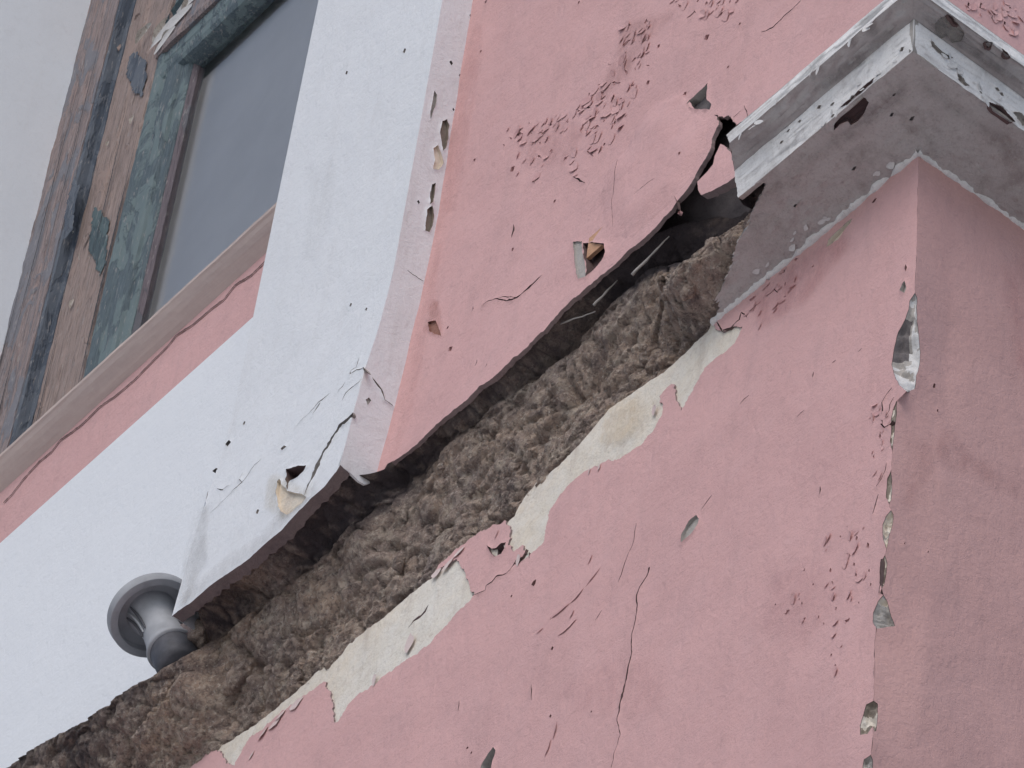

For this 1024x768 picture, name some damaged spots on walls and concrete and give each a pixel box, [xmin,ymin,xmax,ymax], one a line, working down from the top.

peeling [149,0,193,54]
spalling [430,91,454,170]
peeling [503,19,660,183]
spalling [817,47,904,130]
spalling [931,15,1024,126]
crack [488,277,540,301]
spalling [892,265,920,392]
crack [305,359,392,493]
flaking render [7,120,831,768]
spalling [803,402,897,676]
crack [611,527,650,767]
spalling [860,701,877,735]